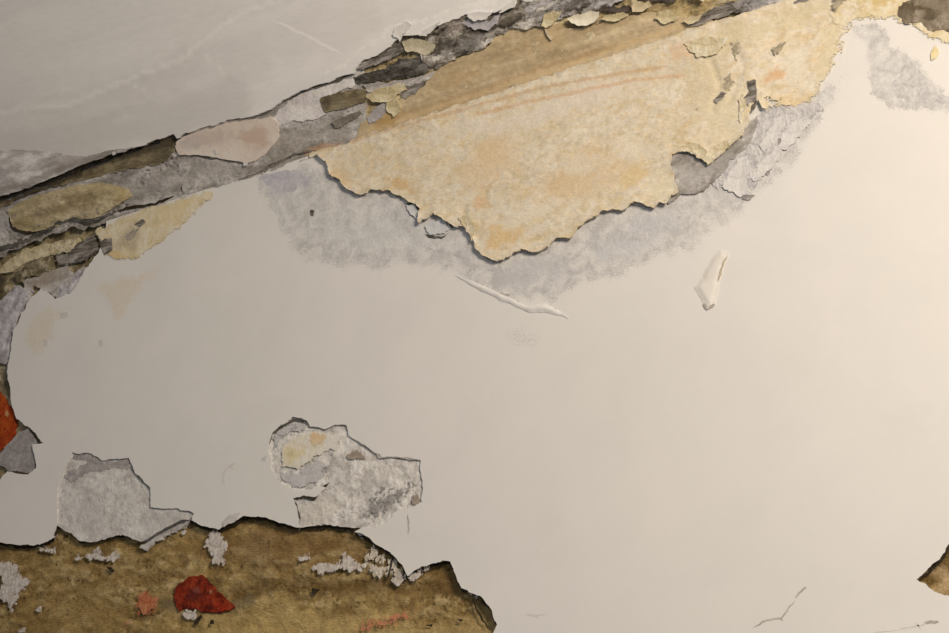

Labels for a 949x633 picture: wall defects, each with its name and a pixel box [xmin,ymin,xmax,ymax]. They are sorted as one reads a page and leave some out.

peeling [0,0,949,479]
damp [255,73,849,305]
flaking render [0,417,497,633]
flaking render [917,544,949,596]